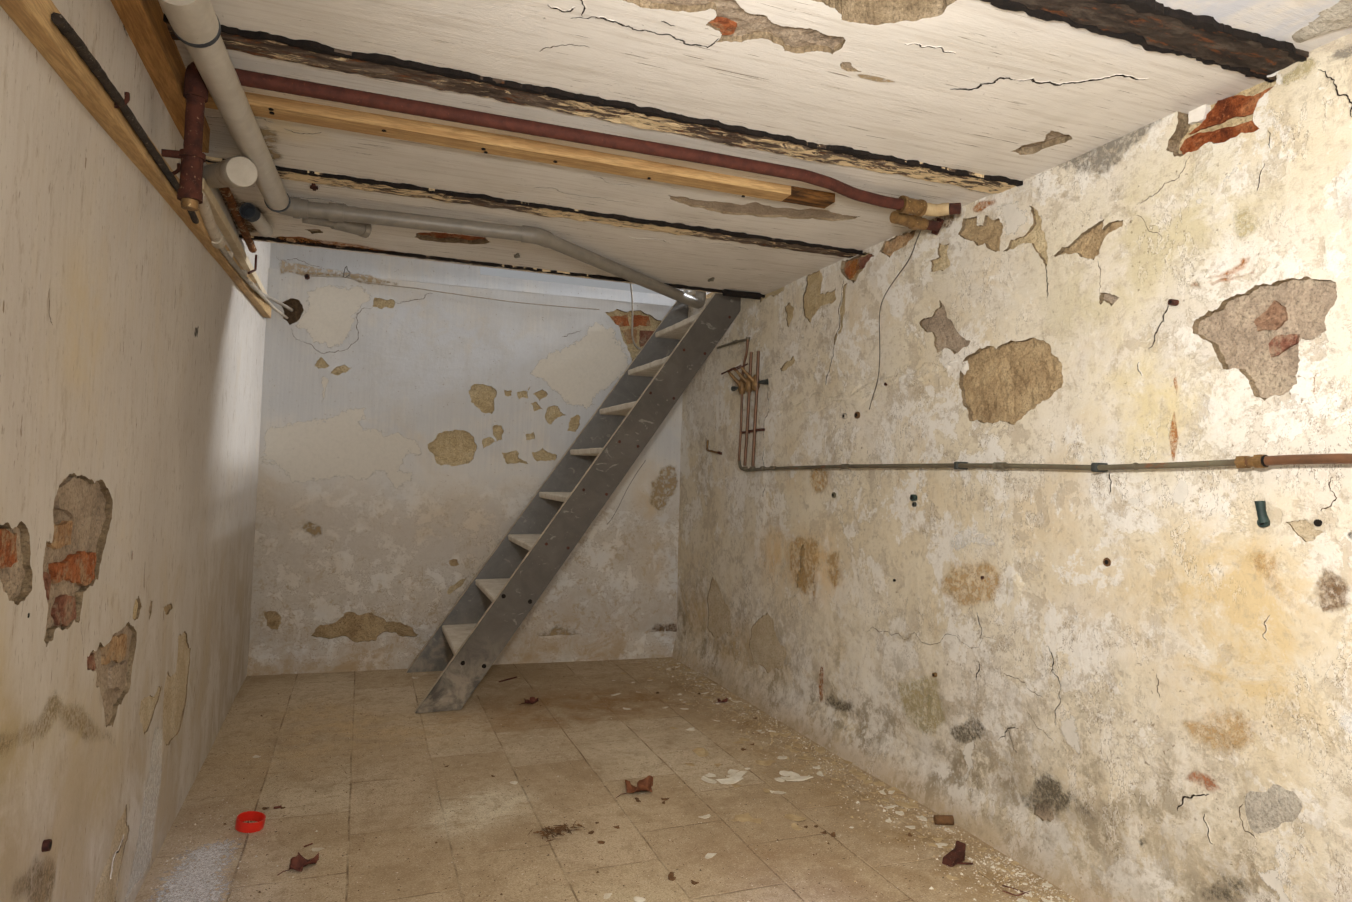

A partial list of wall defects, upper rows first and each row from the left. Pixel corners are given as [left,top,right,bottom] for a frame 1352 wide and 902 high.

crack [541,0,718,51]
flaking render [643,0,855,69]
crack [950,74,1149,91]
flaking render [1178,81,1276,155]
crack [1318,70,1352,118]
flaking render [282,299,304,325]
flaking render [922,304,1064,425]
flaking render [1198,278,1337,398]
flaking render [428,384,580,466]
flaking render [43,476,106,639]
flaking render [87,599,171,725]
flaking render [312,612,418,642]